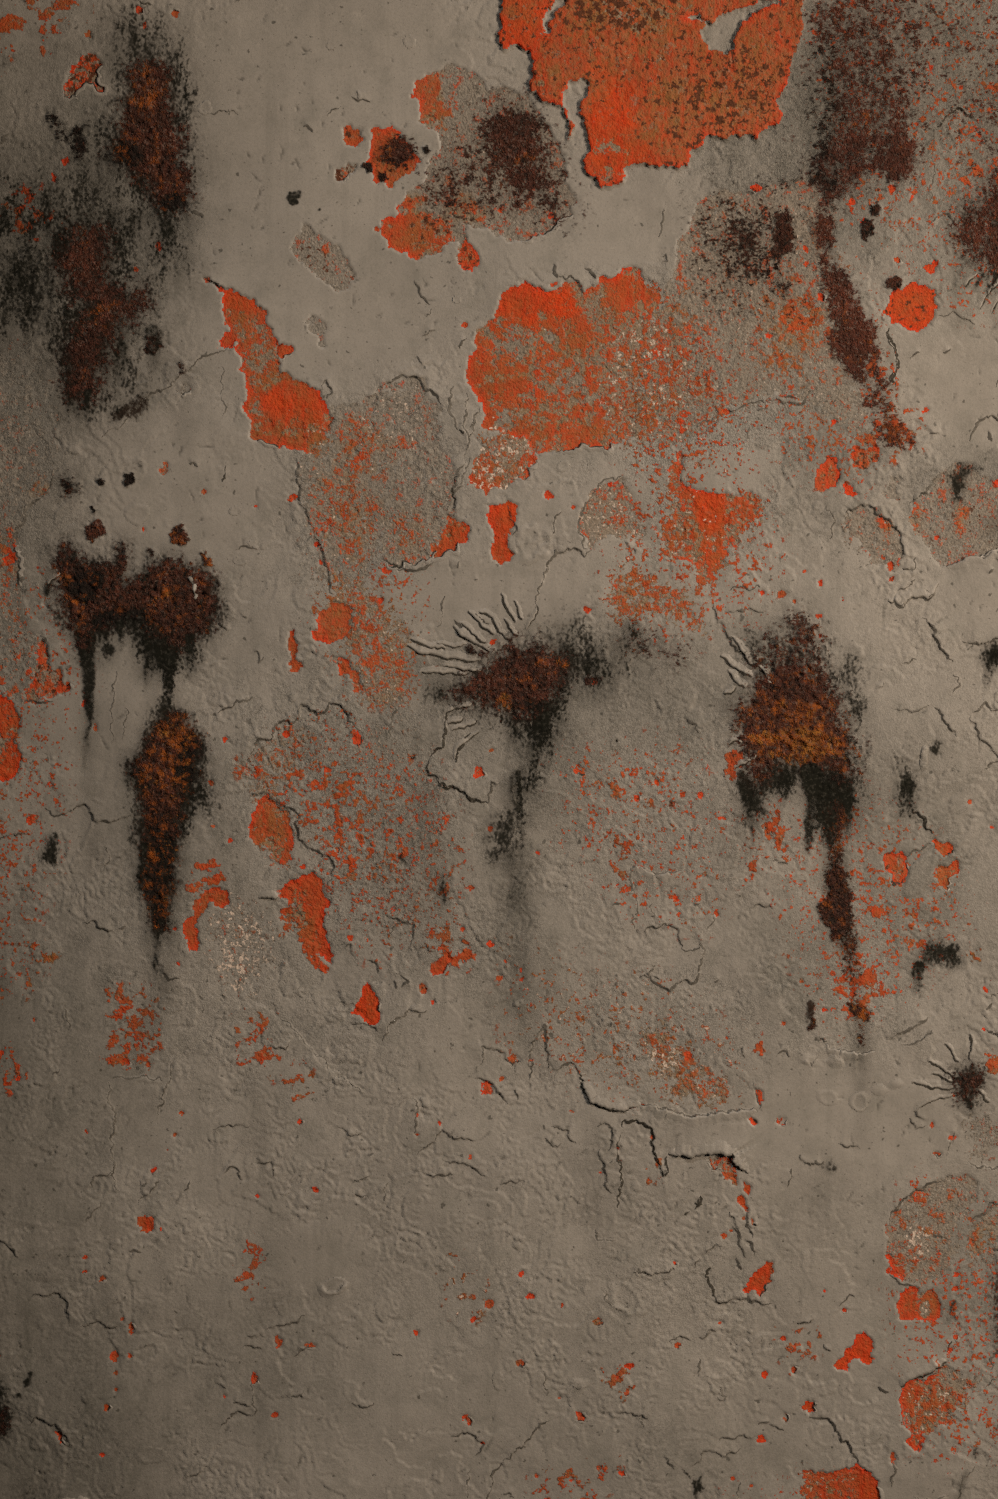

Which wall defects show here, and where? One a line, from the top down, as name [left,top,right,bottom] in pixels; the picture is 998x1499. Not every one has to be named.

rust [0,4,198,421]
peeling [335,0,804,272]
rust [682,0,998,453]
rust [45,463,229,972]
peeling [173,175,998,1102]
rust [720,609,872,1046]
crack [478,1000,932,1241]
crack [604,1196,854,1401]
peeling [885,1112,998,1322]
crack [890,1111,998,1252]
crack [667,1416,975,1499]
peeling [800,1463,885,1499]